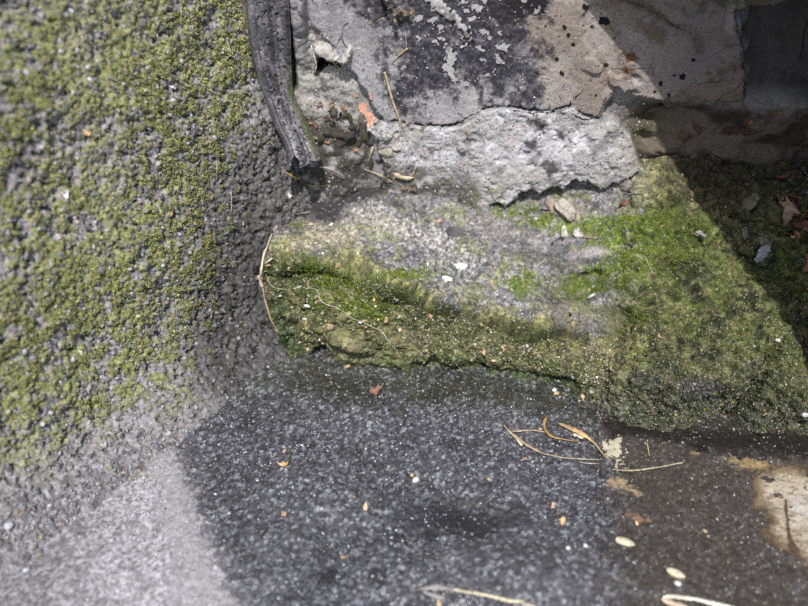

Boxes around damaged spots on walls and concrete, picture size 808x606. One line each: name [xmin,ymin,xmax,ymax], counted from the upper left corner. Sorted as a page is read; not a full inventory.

peeling [314,43,352,76]
peeling [409,0,510,117]
water stain [344,0,592,177]
spalling [354,92,375,128]
crack [376,91,607,133]
water stain [298,187,392,222]